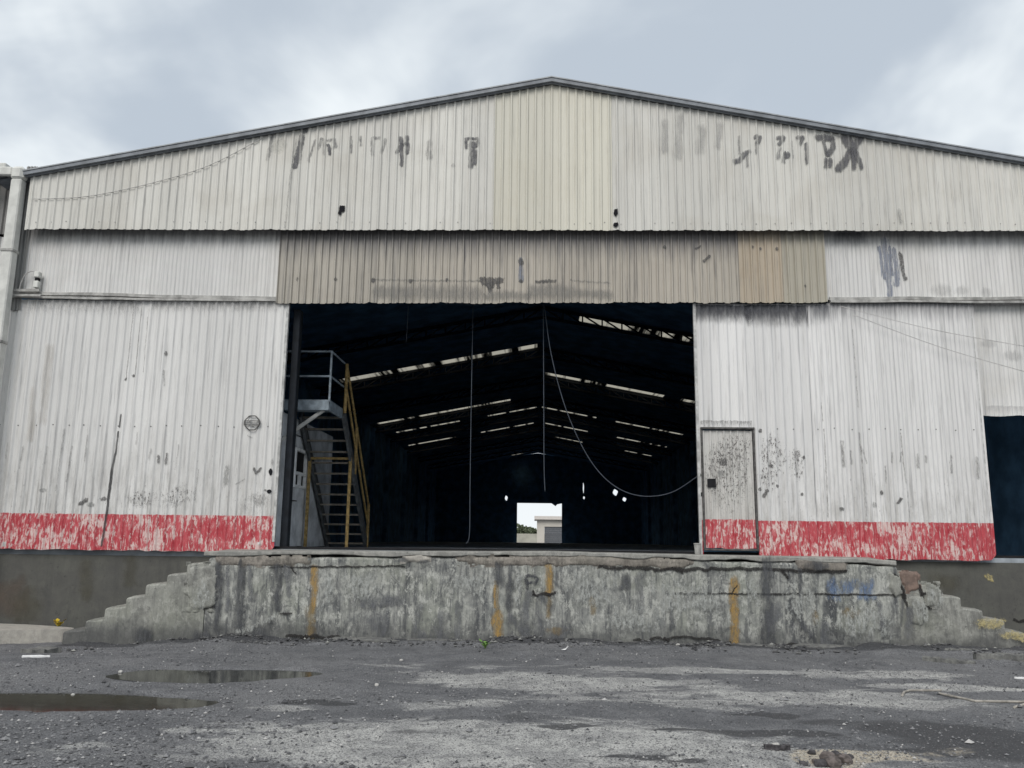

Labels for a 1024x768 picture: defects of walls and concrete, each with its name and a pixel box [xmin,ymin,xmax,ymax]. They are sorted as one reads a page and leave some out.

water stain [495,563,565,639]
water stain [619,575,644,610]
spalling [887,570,944,630]